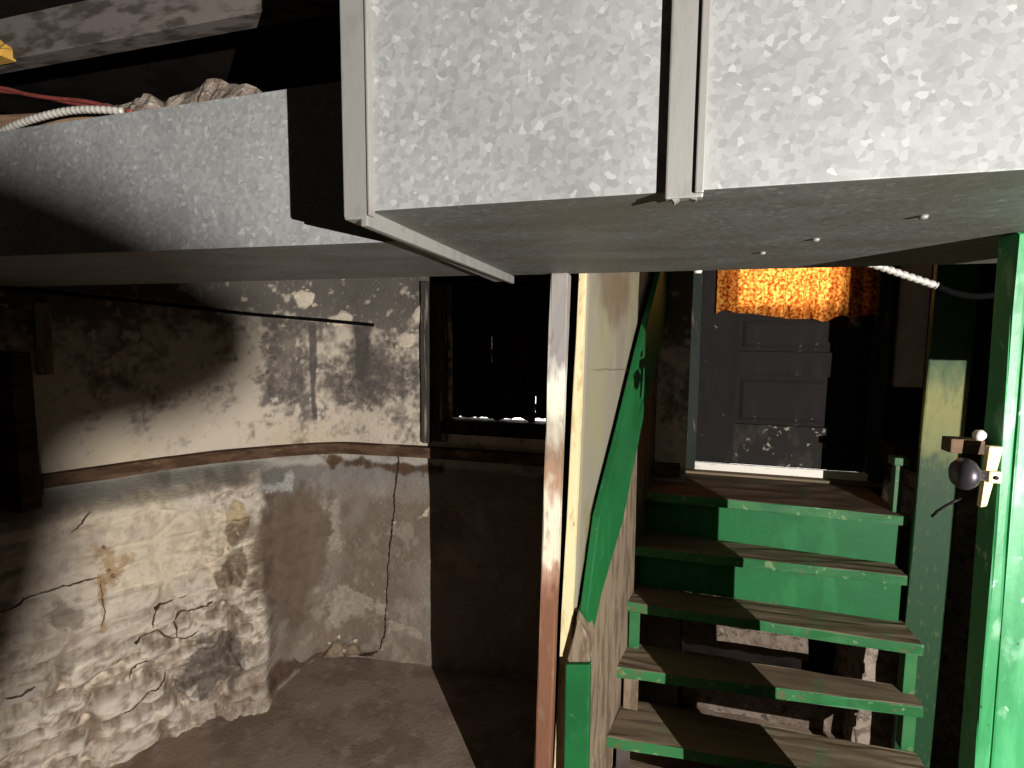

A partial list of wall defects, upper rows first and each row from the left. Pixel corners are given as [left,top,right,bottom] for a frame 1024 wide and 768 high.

water stain [257,322,418,419]
crack [0,577,106,628]
crack [120,596,213,715]
crack [326,457,400,657]